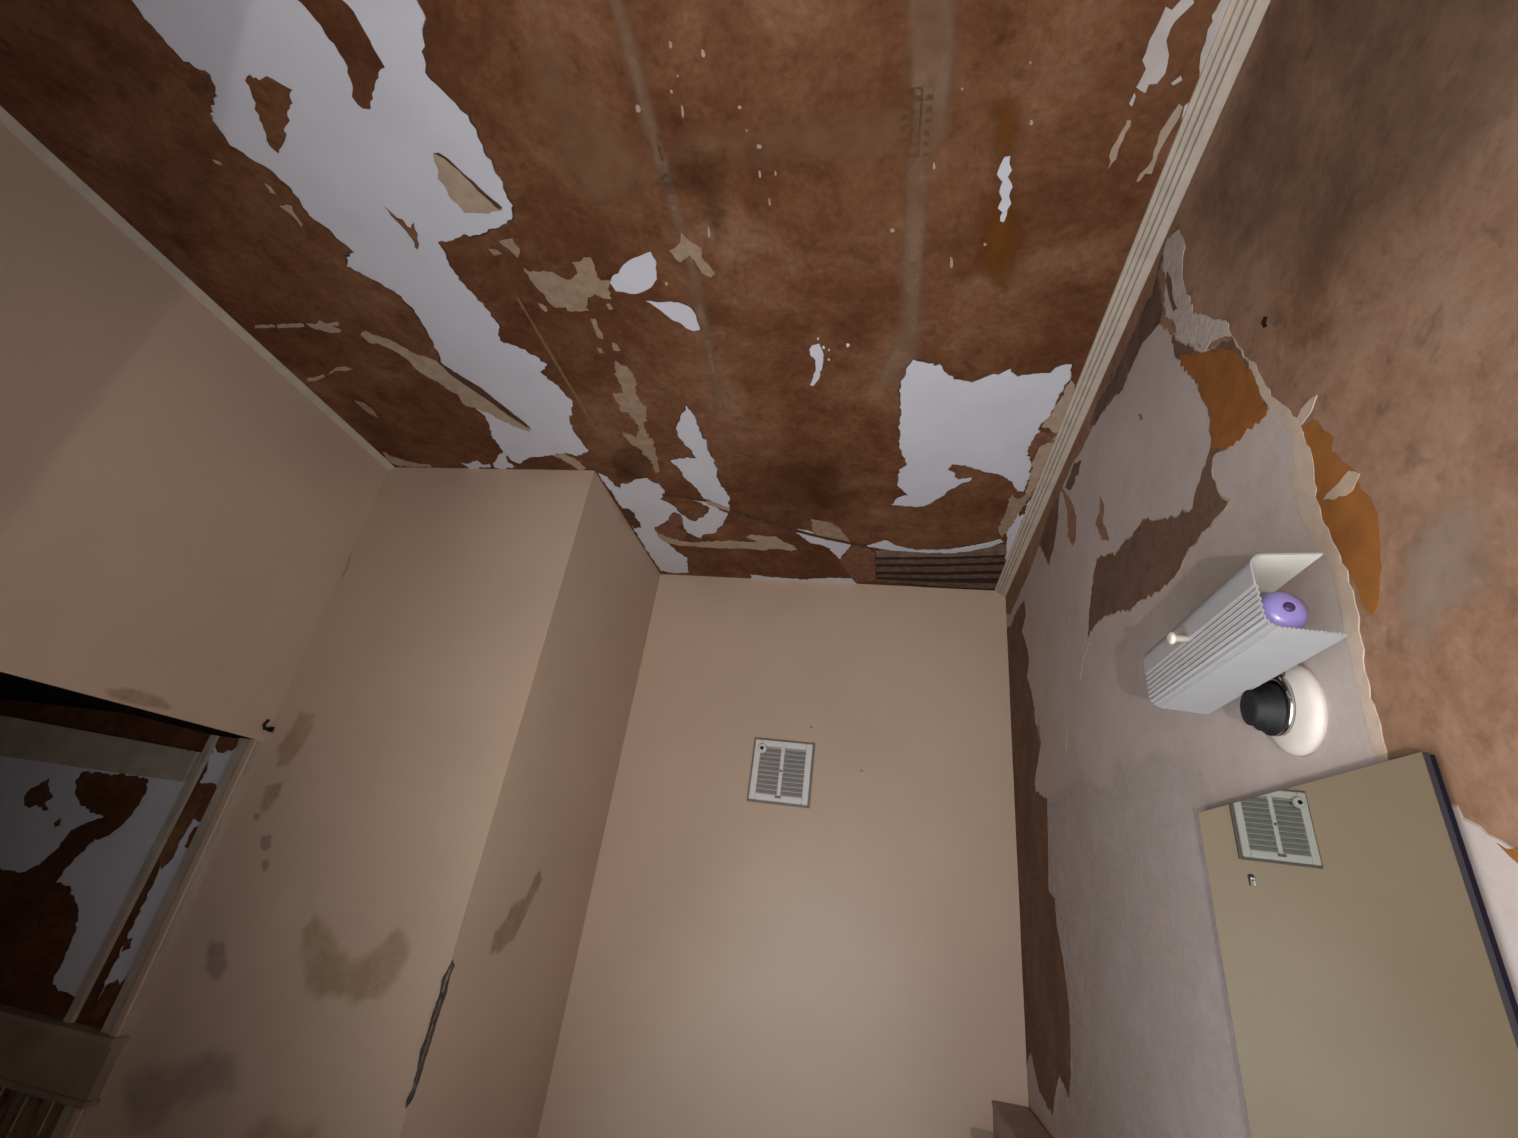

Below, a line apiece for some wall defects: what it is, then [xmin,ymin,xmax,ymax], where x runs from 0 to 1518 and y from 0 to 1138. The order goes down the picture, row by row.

peeling [1129,0,1194,106]
peeling [130,0,731,574]
peeling [751,519,877,584]
peeling [809,338,850,386]
peeling [890,359,1075,560]
peeling [997,156,1013,222]
flaking render [1006,256,1389,1138]
peeling [0,736,240,1019]
flaking render [1451,804,1518,1005]
crack [405,959,455,1109]